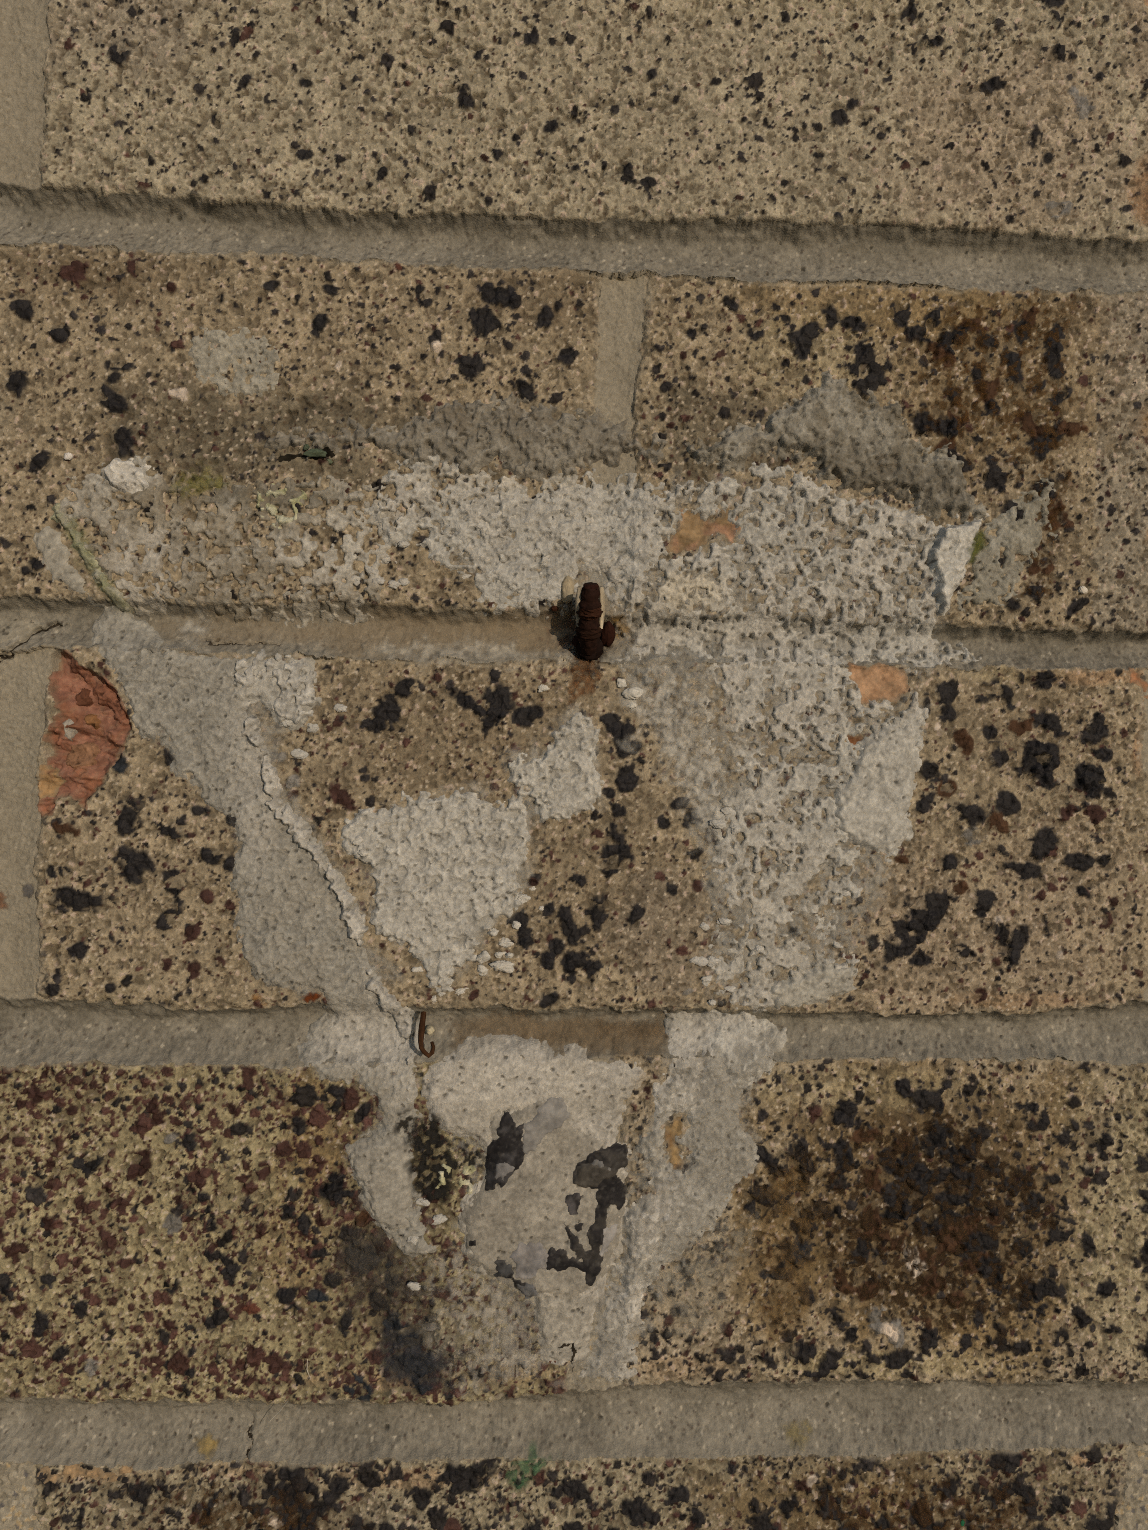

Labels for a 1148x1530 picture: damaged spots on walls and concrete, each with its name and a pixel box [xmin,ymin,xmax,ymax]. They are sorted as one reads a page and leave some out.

spalling [37,649,132,818]
damp [804,1114,1056,1334]